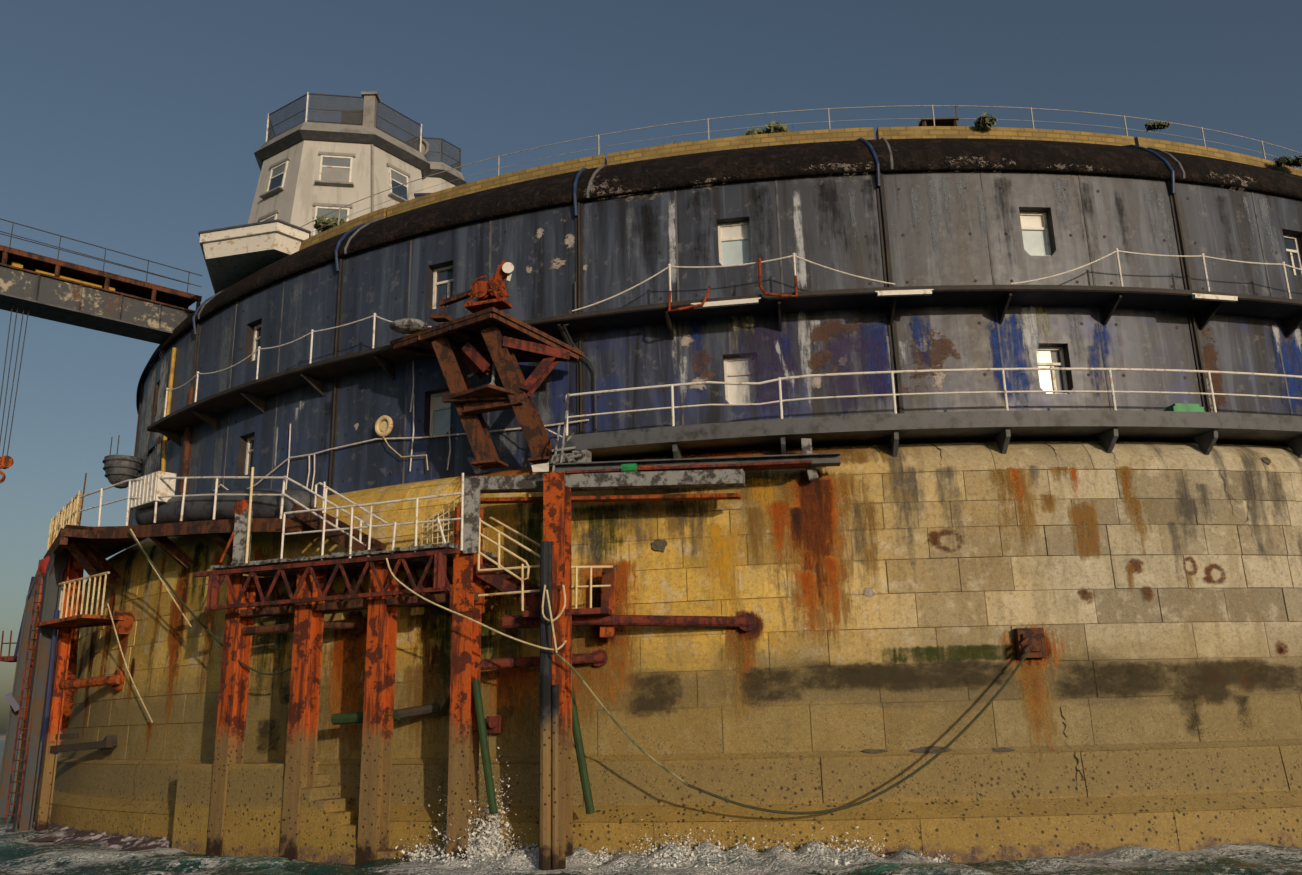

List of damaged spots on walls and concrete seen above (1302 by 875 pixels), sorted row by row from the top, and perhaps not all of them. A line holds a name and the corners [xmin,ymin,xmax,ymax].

peeling [807,318,862,389]
corrosion [75,554,190,746]
corrosion [252,546,278,689]
water stain [628,675,681,716]
corrosion [666,444,889,715]
water stain [742,659,1012,704]
corrosion [928,529,963,552]
corrosion [1004,626,1064,744]
corrosion [993,467,1100,558]
corrosion [1117,466,1155,600]
water stain [1057,659,1302,732]
corrosion [1183,556,1225,588]